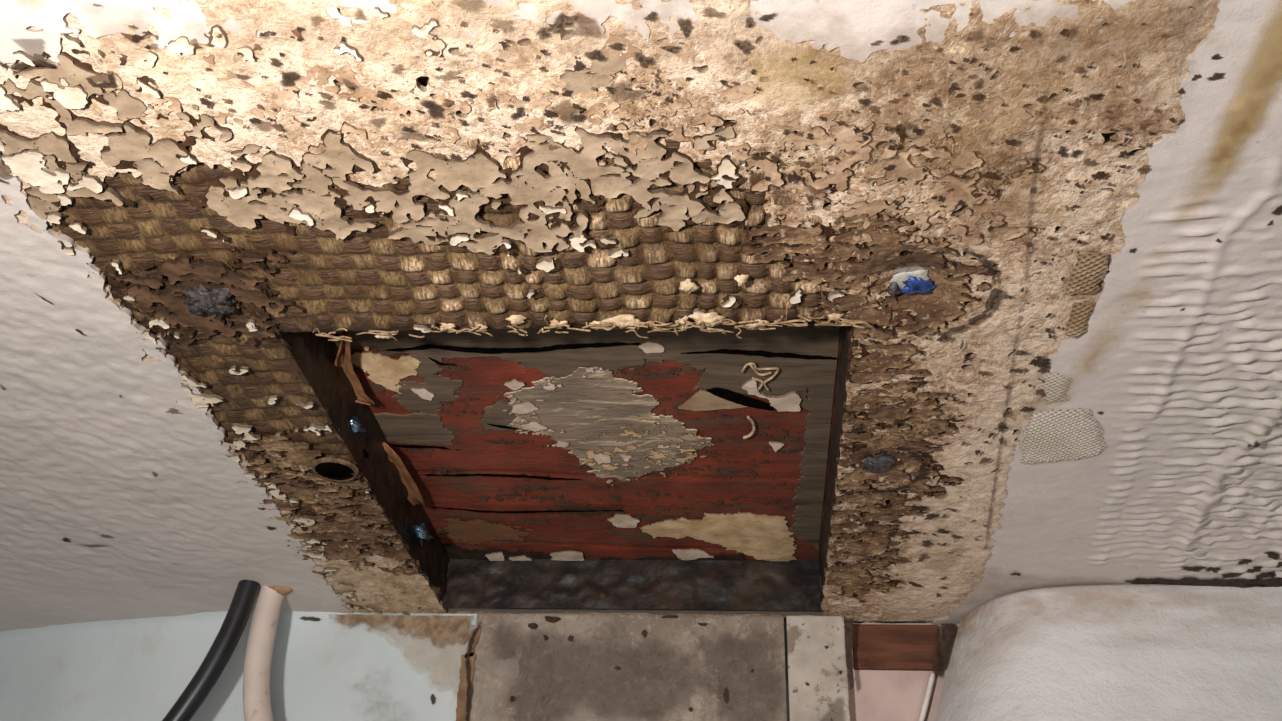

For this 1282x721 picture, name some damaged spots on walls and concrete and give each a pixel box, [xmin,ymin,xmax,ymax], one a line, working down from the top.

water stain [1178,54,1224,94]
peeling [599,235,629,258]
peeling [535,257,556,273]
peeling [105,227,304,360]
peeling [679,279,700,293]
peeling [734,275,750,286]
peeling [788,287,802,304]
peeling [348,294,851,561]
peeling [830,416,866,525]
peeling [221,423,815,684]
peeling [1181,551,1282,580]
water stain [528,616,561,640]